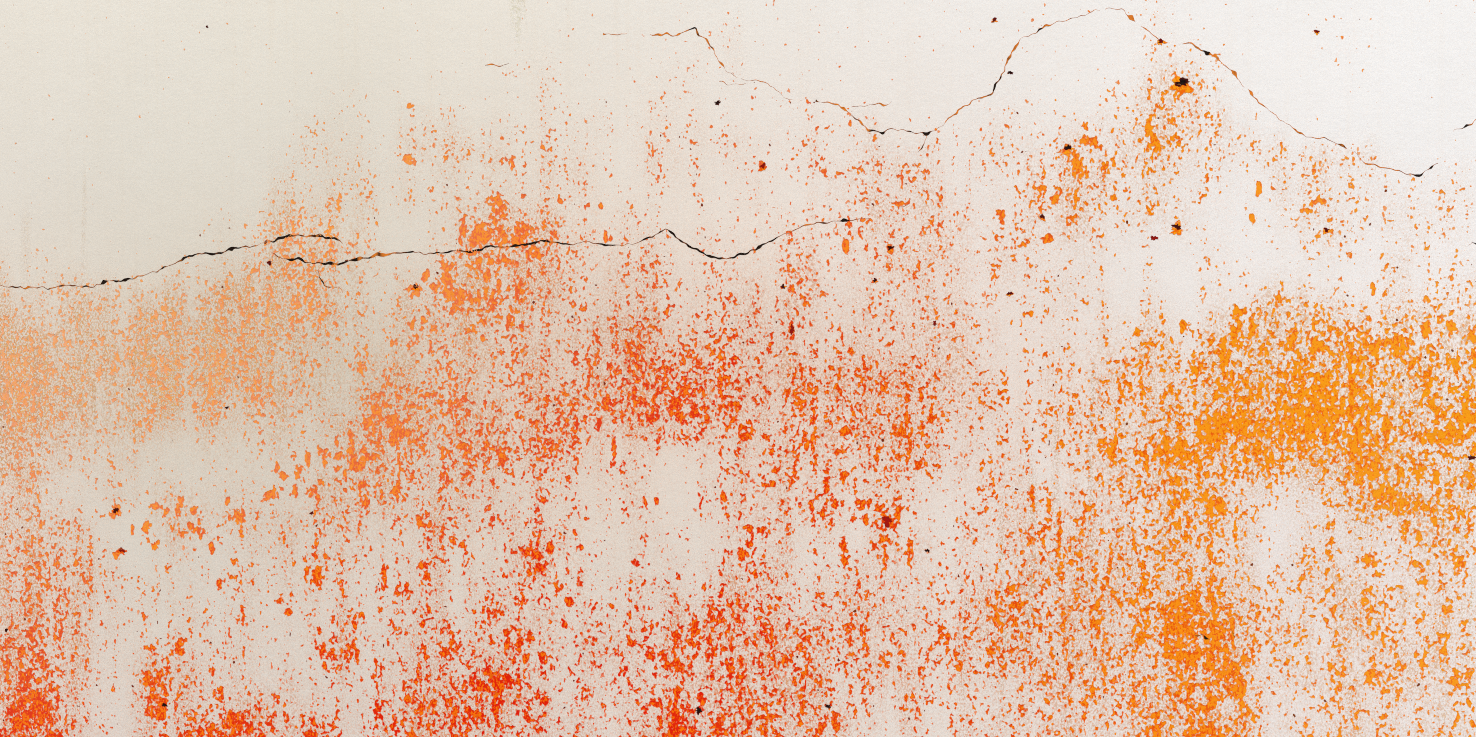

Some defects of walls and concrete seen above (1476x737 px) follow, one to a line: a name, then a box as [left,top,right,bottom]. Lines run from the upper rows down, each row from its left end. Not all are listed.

crack [603,8,1437,177]
peeling [262,199,598,369]
crack [1,204,908,293]
peeling [95,390,416,602]